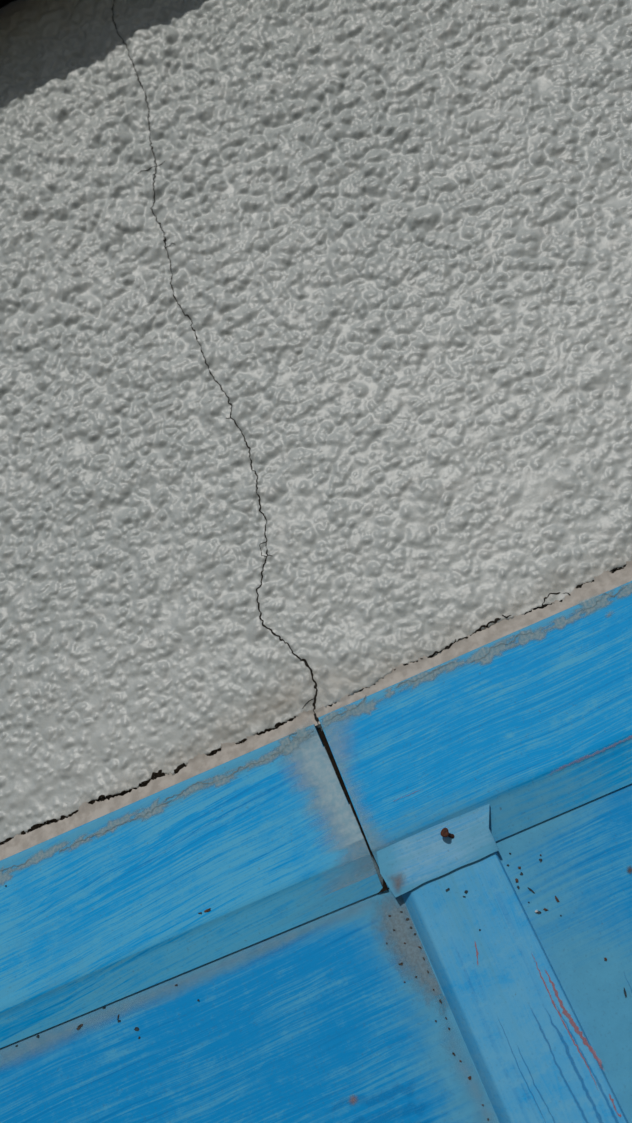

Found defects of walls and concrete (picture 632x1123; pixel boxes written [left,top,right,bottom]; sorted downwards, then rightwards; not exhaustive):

crack [0,0,627,845]